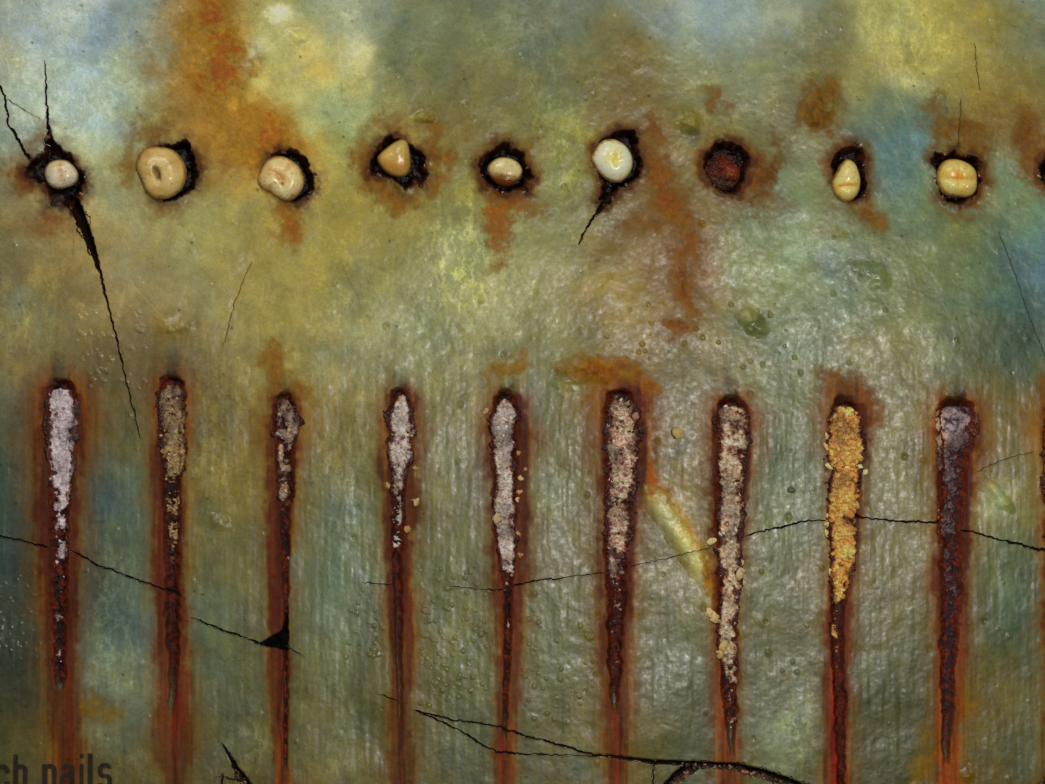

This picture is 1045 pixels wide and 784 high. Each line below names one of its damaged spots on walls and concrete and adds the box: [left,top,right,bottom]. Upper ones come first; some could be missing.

crack [0,61,53,159]
crack [65,194,141,439]
rust [28,376,90,784]
crack [0,535,305,657]
crack [215,742,253,784]
rust [480,351,538,784]
crack [382,694,810,784]
rust [565,355,670,784]
rust [702,390,758,784]
rust [817,369,882,784]
crack [855,514,1045,551]
rust [928,391,987,784]